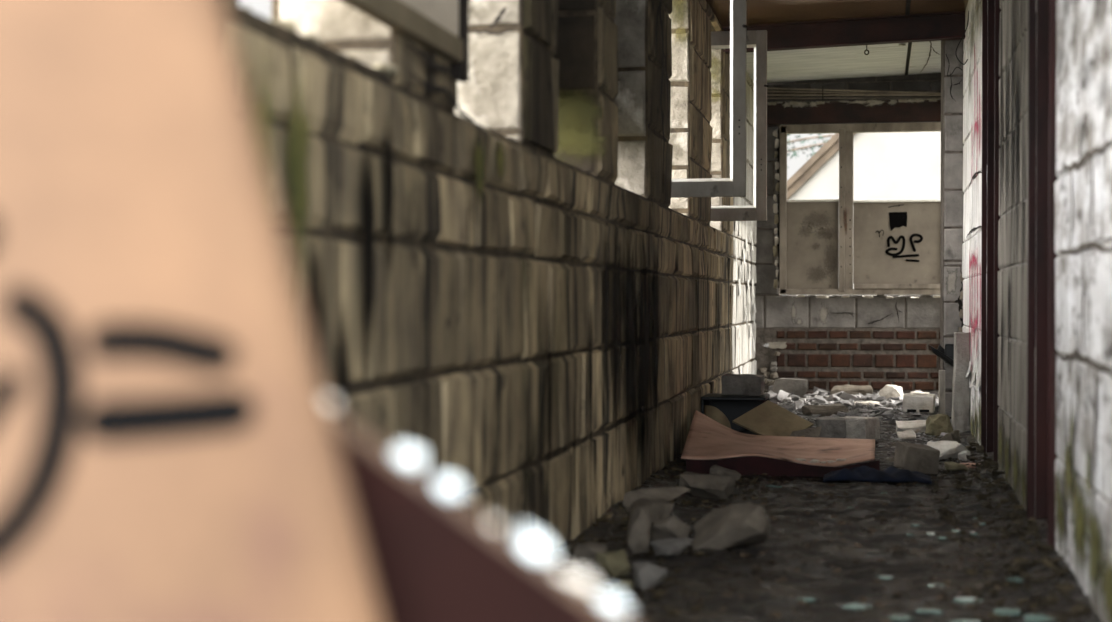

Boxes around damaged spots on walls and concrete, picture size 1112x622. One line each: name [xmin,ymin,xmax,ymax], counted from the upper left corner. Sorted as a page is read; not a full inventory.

damp [589,234,660,460]
crack [1054,124,1112,468]